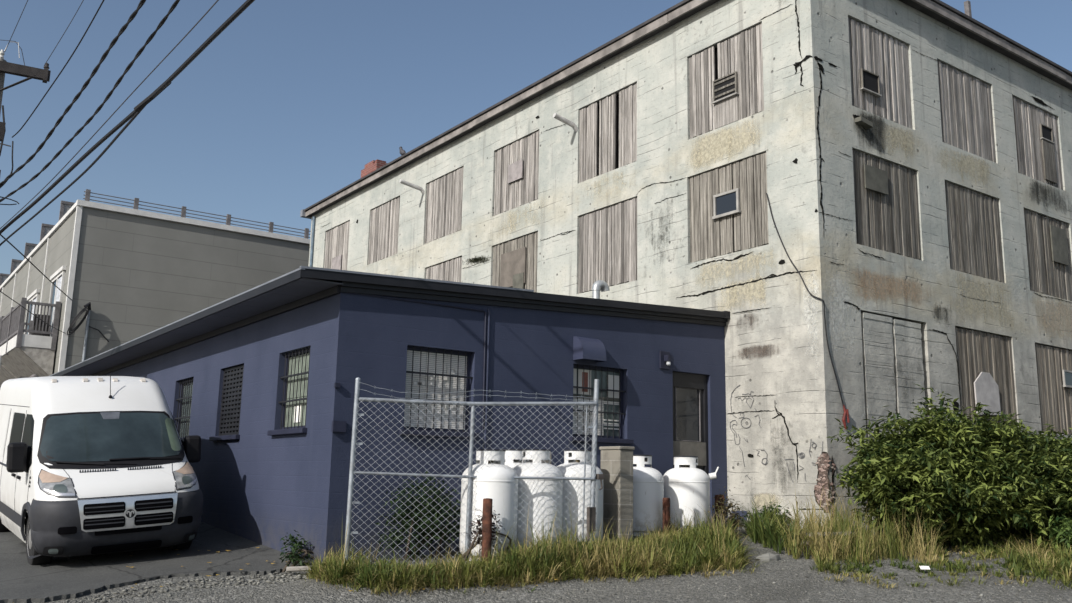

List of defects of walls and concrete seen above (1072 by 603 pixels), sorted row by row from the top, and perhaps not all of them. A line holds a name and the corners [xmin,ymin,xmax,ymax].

crack [761,0,851,231]
crack [677,248,884,314]
crack [728,395,823,510]
spalling [814,452,836,517]